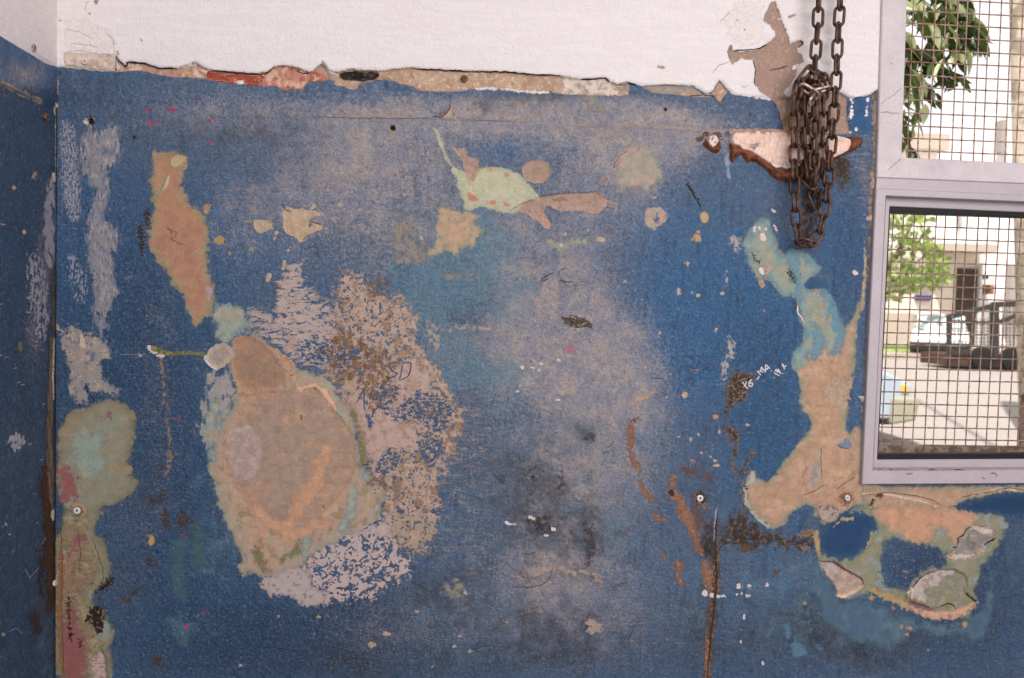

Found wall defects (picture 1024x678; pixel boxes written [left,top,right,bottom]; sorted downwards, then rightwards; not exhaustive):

peeling [25,119,138,405]
flaking render [63,0,1024,530]
corrosion [625,389,717,564]
corrosion [659,551,686,588]
flaking render [819,560,875,601]
flaking render [891,525,996,628]
peeling [91,650,108,678]